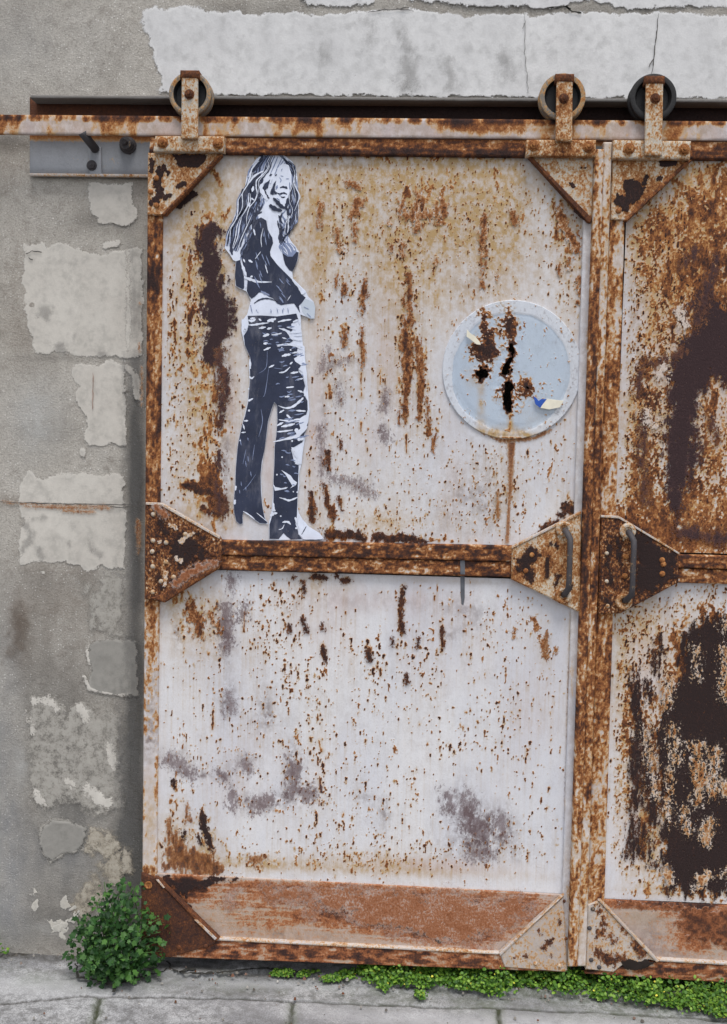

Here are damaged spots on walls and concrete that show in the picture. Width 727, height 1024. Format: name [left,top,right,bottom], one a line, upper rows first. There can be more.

flaking render [140,0,727,99]
crack [522,5,581,86]
crack [649,14,659,74]
flaking render [87,182,138,226]
flaking render [21,239,145,457]
corrosion [189,220,238,432]
corrosion [307,438,429,544]
corrosion [394,270,441,454]
corrosion [600,240,727,608]
flaking render [18,467,140,940]
corrosion [591,603,727,969]
corrosion [161,802,555,958]